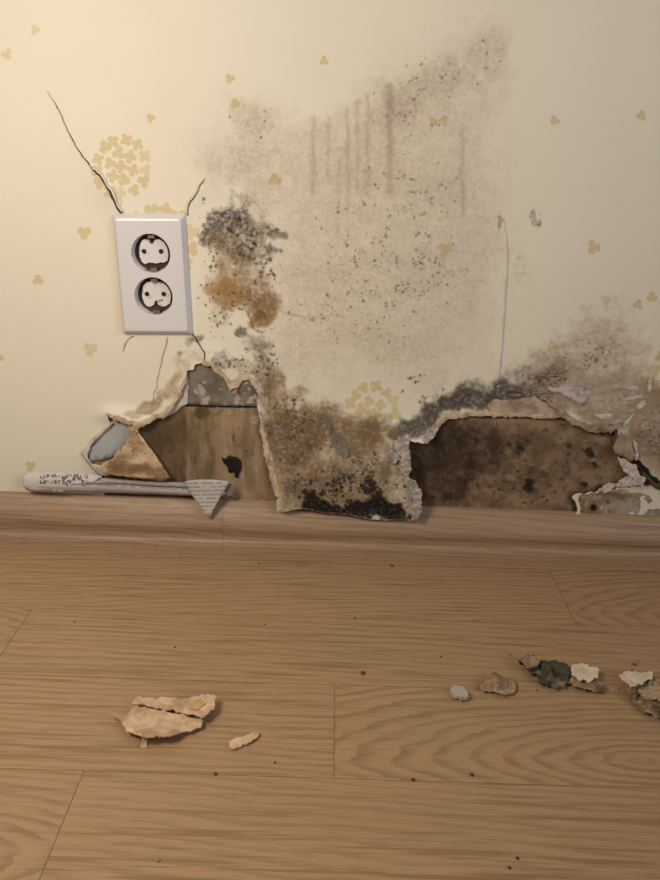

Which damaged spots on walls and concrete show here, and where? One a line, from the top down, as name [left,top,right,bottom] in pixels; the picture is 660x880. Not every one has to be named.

crack [47,91,124,214]
leakage [136,375,177,415]
peeling [81,360,280,503]
leakage [190,206,660,520]
peeling [386,393,660,520]